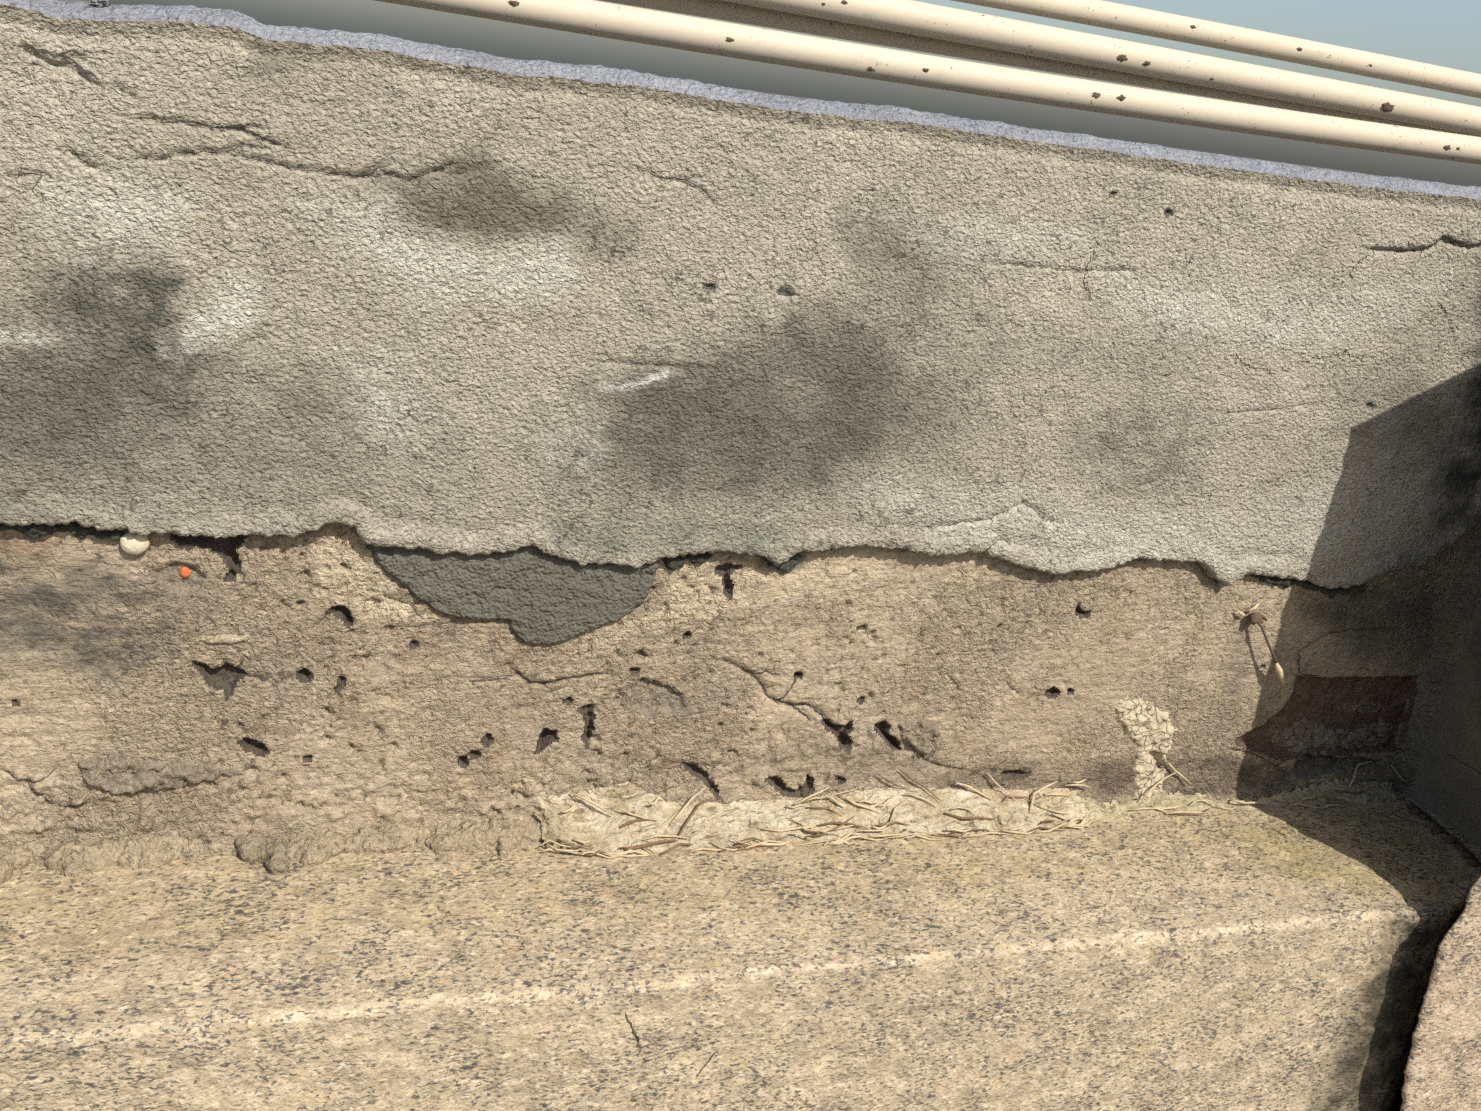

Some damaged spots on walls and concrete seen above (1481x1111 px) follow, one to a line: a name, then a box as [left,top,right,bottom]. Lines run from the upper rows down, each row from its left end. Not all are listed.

damp [227,33,356,97]
crack [140,116,478,180]
crack [1378,235,1481,251]
damp [0,113,1481,699]
spalling [148,560,206,596]
spalling [630,678,689,718]
spalling [1235,675,1419,781]